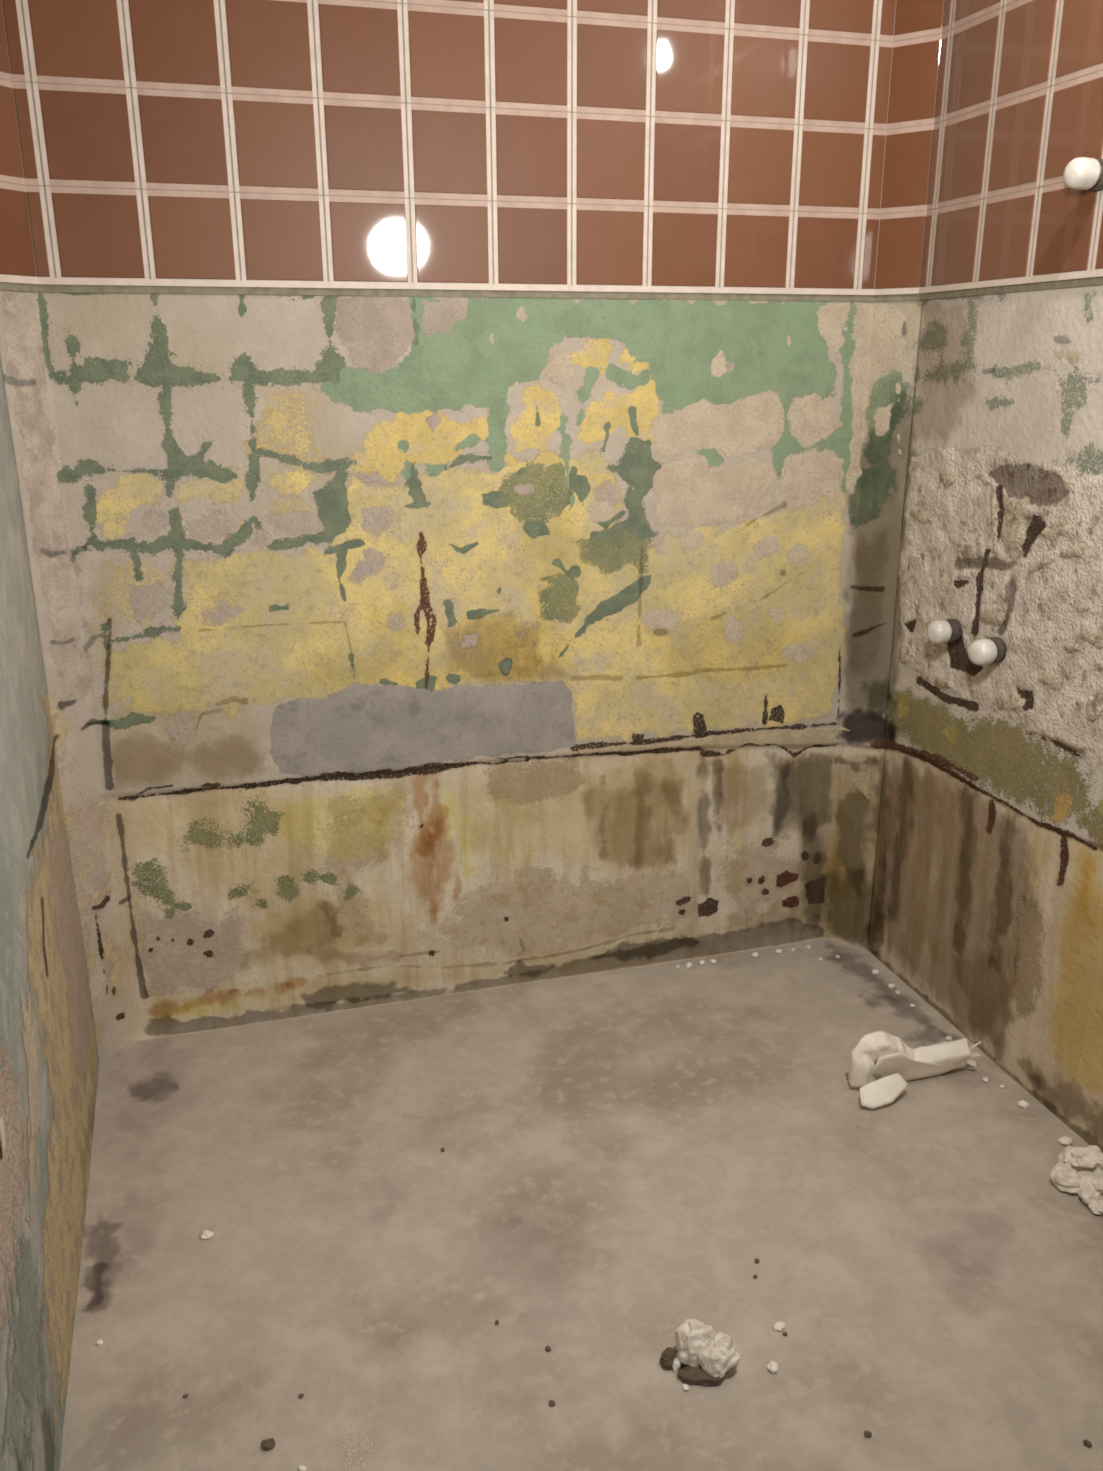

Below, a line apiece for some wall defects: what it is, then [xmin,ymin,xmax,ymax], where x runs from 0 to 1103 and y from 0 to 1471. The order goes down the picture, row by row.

peeling [0,290,1103,1448]
leakage [301,780,810,966]
crack [118,650,1097,887]
leakage [1009,892,1051,1019]